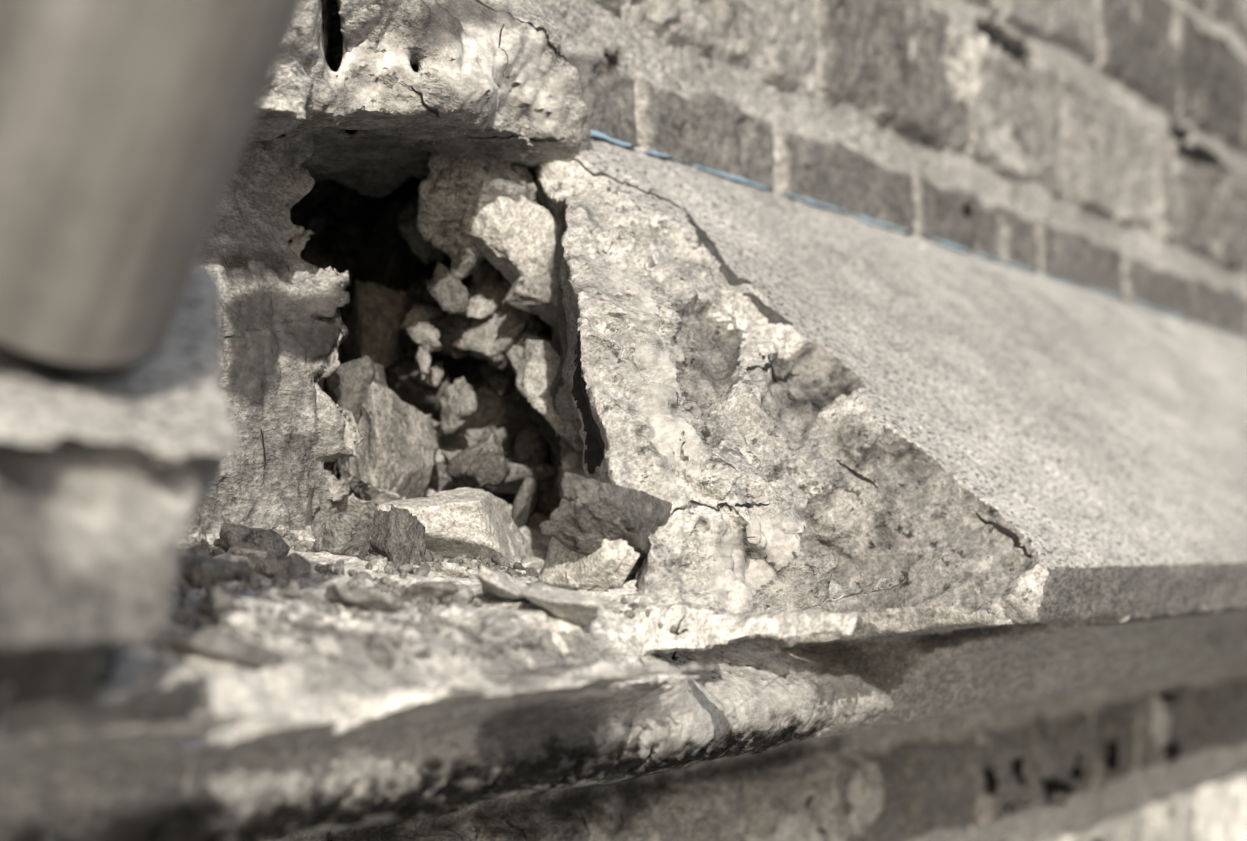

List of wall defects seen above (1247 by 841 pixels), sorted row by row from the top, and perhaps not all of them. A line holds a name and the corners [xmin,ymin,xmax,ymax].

crack [476,0,567,76]
spalling [604,50,620,67]
spalling [987,17,1030,67]
crack [411,86,440,118]
crack [467,134,793,325]
spalling [0,131,1049,754]